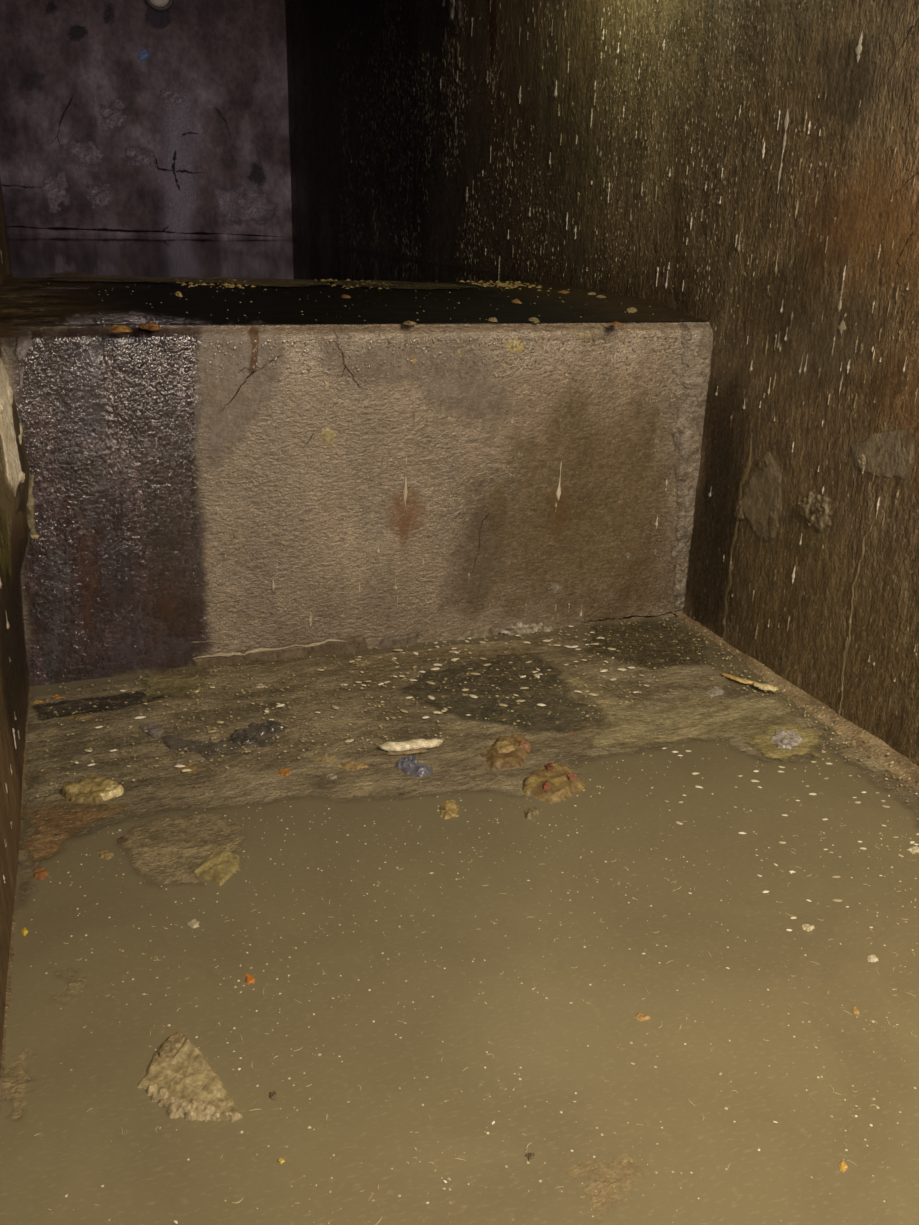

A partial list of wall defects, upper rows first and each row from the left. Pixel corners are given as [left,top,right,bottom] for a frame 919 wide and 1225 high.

crack [155,109,231,190]
crack [221,355,284,411]
rust [249,327,259,373]
crack [334,331,363,389]
peeling [850,427,915,480]
peeling [735,451,782,542]
peeling [797,491,831,550]